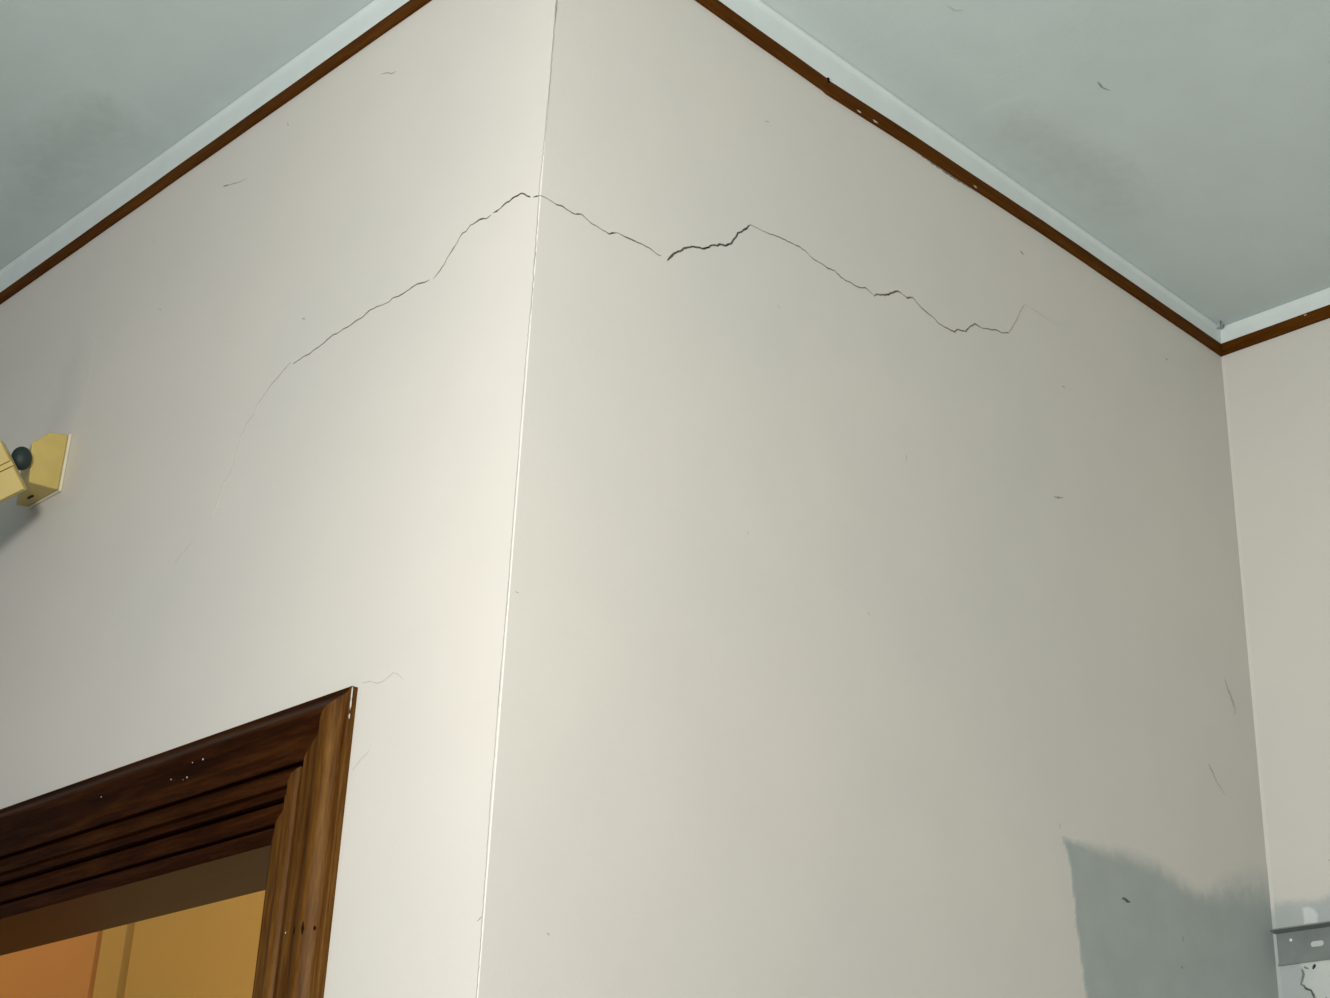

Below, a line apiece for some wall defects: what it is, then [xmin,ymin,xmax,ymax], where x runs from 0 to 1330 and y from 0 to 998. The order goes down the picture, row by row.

crack [167,0,1058,998]